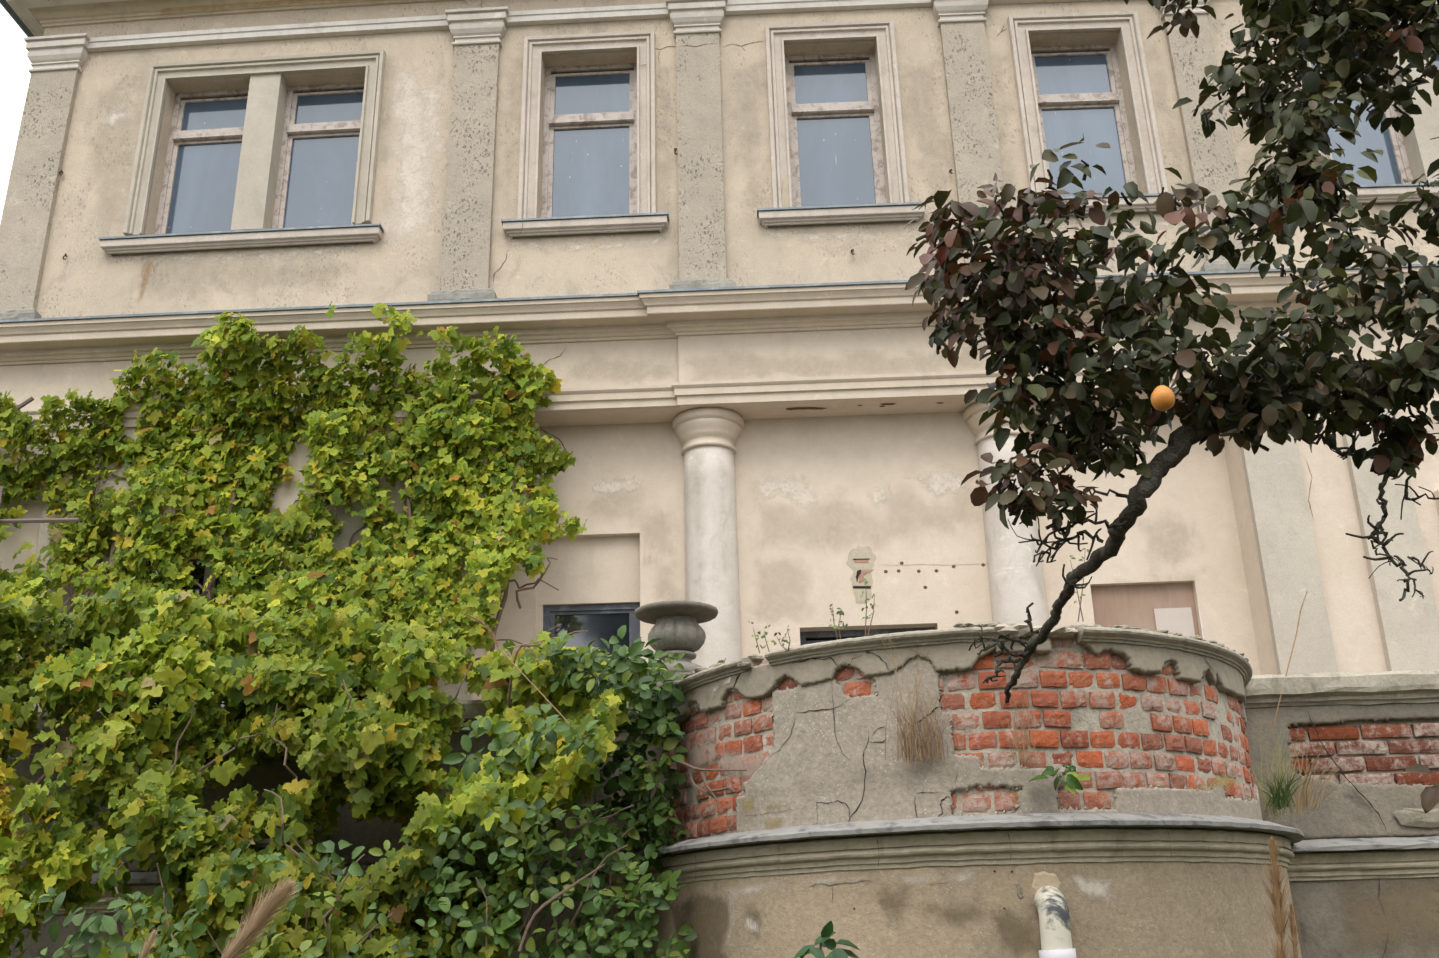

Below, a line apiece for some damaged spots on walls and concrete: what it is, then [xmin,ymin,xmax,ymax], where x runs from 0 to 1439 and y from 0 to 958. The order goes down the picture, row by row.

flaking render [668,678,800,842]
crack [747,646,938,899]
flaking render [834,666,878,698]
flaking render [1288,723,1439,786]